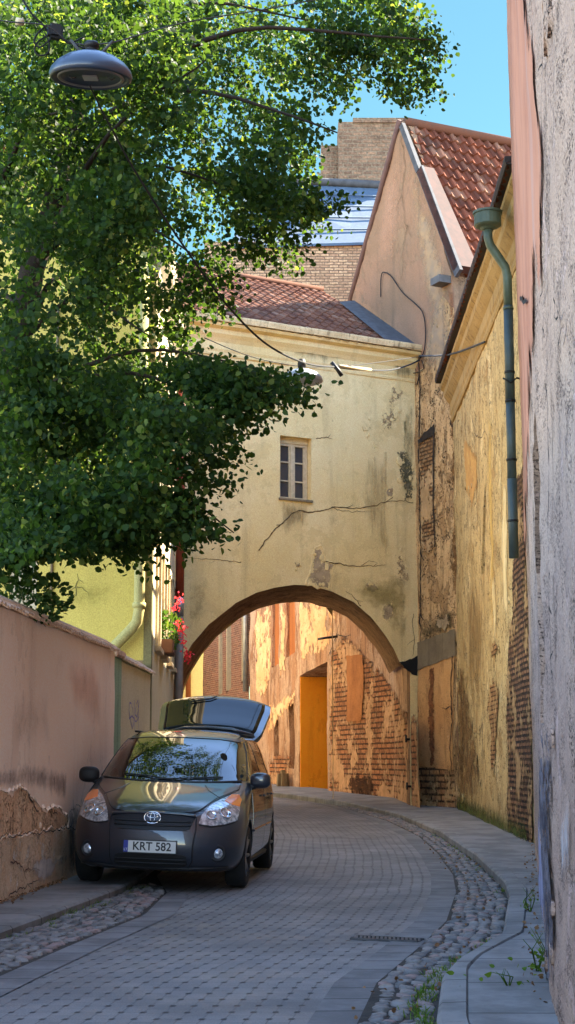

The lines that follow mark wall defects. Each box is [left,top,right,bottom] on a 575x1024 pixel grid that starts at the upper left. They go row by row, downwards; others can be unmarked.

crack [188,378,424,670]
flaking render [0,784,77,902]
flaking render [295,452,555,974]